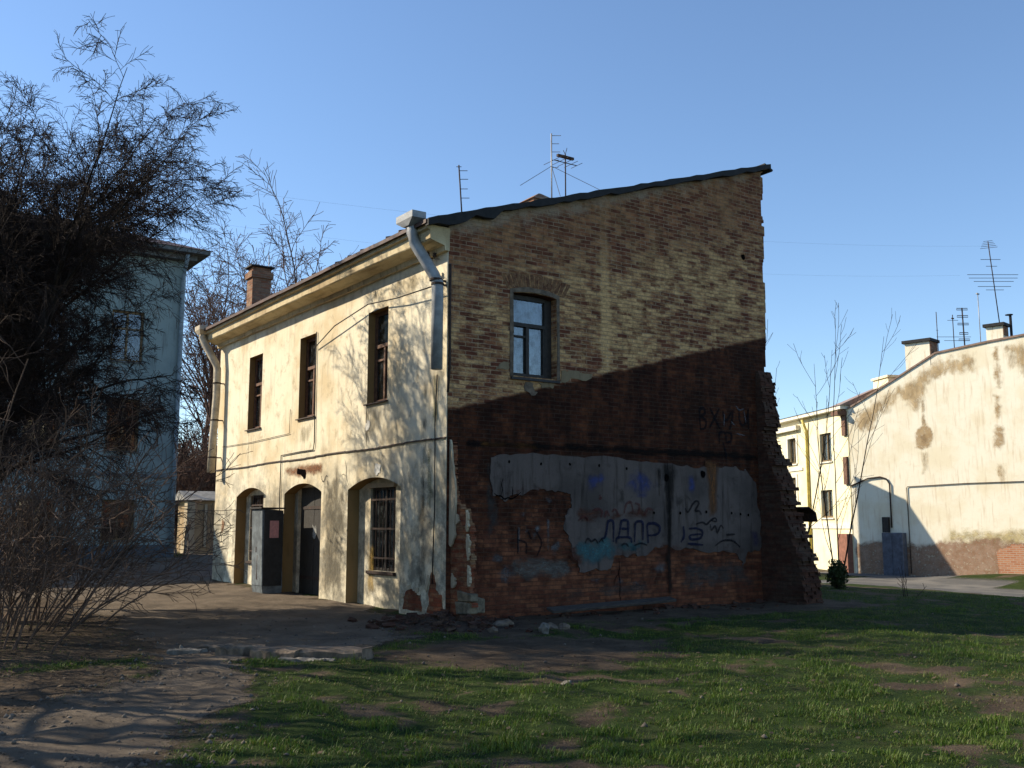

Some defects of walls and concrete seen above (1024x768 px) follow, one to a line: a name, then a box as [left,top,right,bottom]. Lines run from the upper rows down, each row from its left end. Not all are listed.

leakage [856,358,973,430]
leakage [995,396,1003,447]
flaking render [489,453,762,580]
flaking render [400,572,443,614]